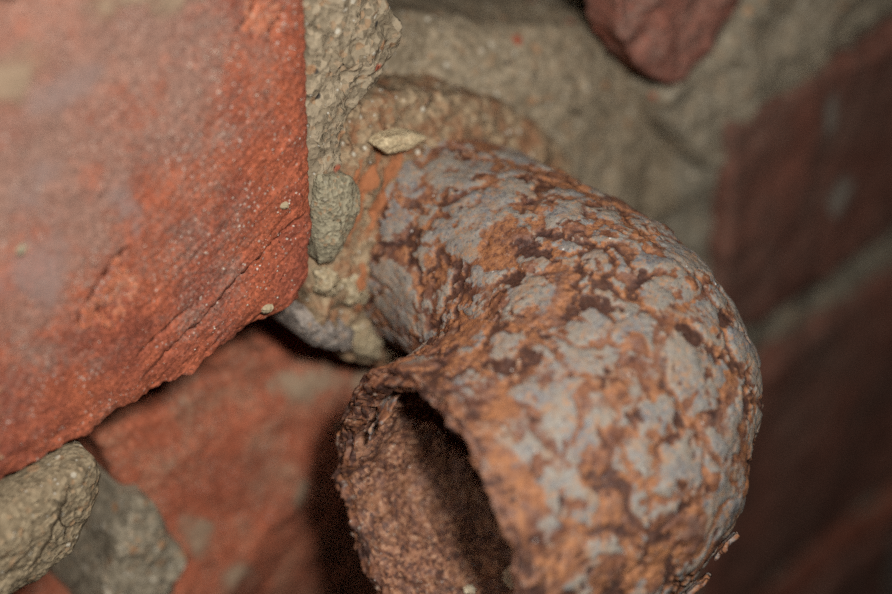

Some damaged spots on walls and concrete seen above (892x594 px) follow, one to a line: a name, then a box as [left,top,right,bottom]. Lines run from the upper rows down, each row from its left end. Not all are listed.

rust [348,151,411,240]
crack [77,245,130,329]
crack [136,210,306,378]
rust [367,391,402,441]
rust [685,572,712,594]
rust [714,532,740,561]